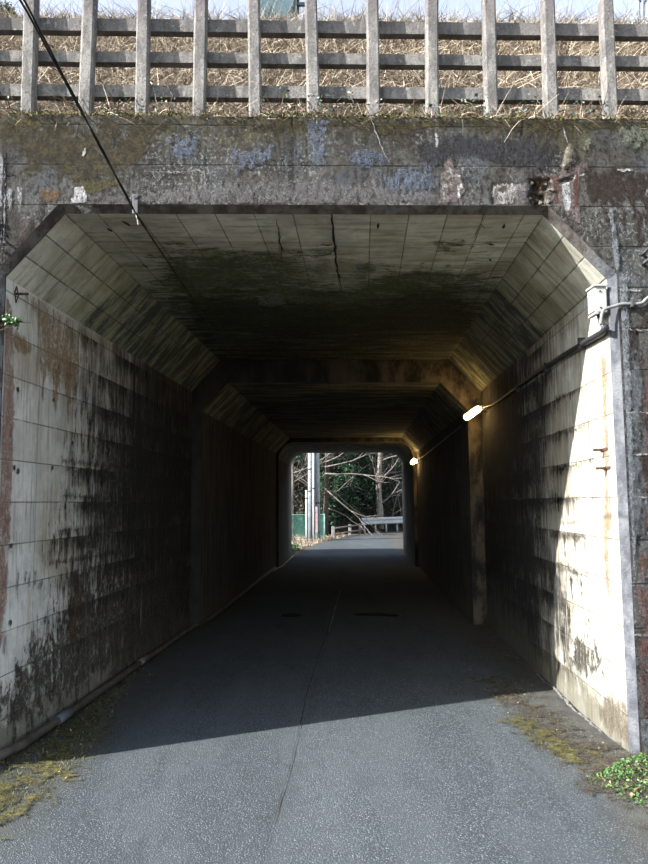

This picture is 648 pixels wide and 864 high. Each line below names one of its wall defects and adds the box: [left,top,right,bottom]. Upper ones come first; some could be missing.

spalling [491,174,585,205]
crack [325,216,346,291]
damp [0,299,193,742]
damp [481,347,604,680]
damp [599,697,629,748]